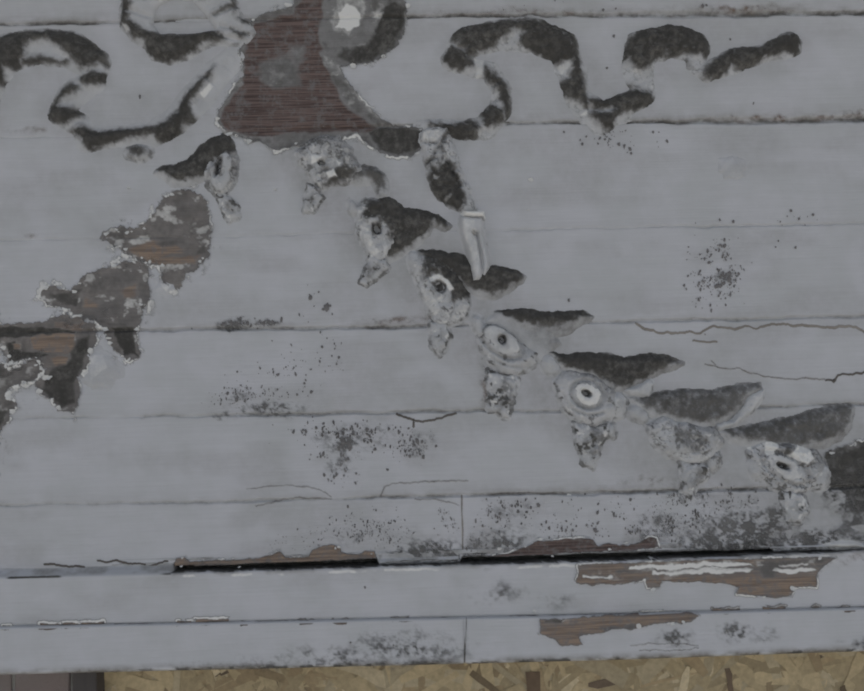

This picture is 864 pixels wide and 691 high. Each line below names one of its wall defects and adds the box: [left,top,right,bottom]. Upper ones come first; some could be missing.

peeling [214,0,423,160]
peeling [0,185,213,437]
leakage [683,238,752,313]
crack [635,322,864,343]
crack [709,364,864,383]
peeling [825,439,864,512]
leakage [270,471,864,561]
peeling [174,545,376,568]
peeling [492,535,835,611]
peeling [533,609,699,646]